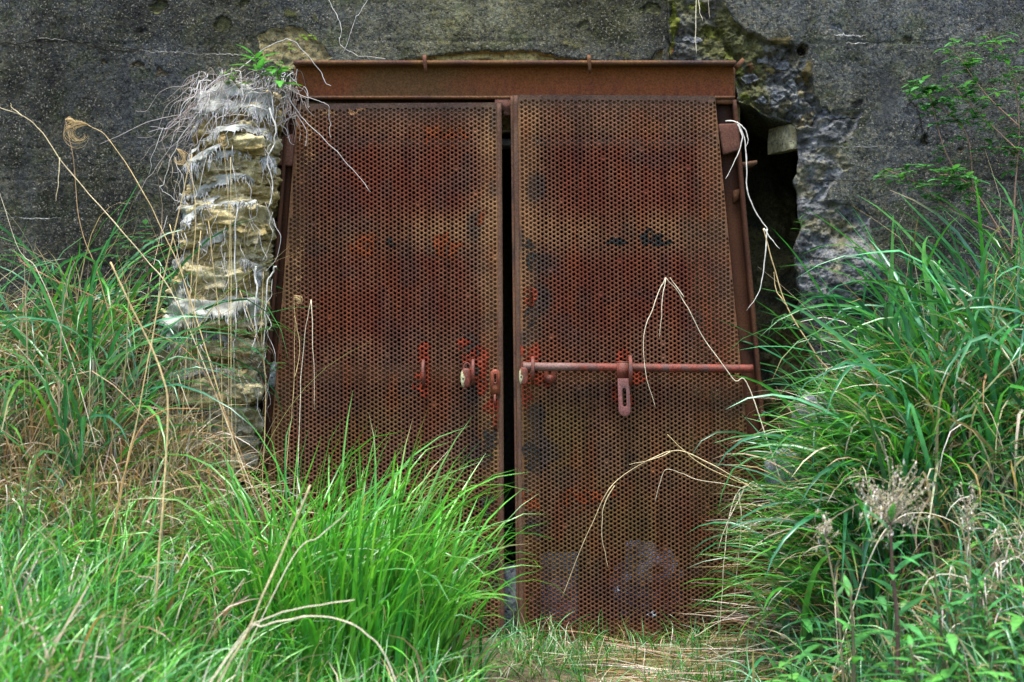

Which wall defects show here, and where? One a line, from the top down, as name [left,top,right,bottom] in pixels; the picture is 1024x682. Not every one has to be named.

rust [425,126,468,151]
spalling [652,0,883,349]
rust [349,234,377,256]
rust [431,232,468,259]
rust [291,235,305,301]
rust [565,488,617,513]